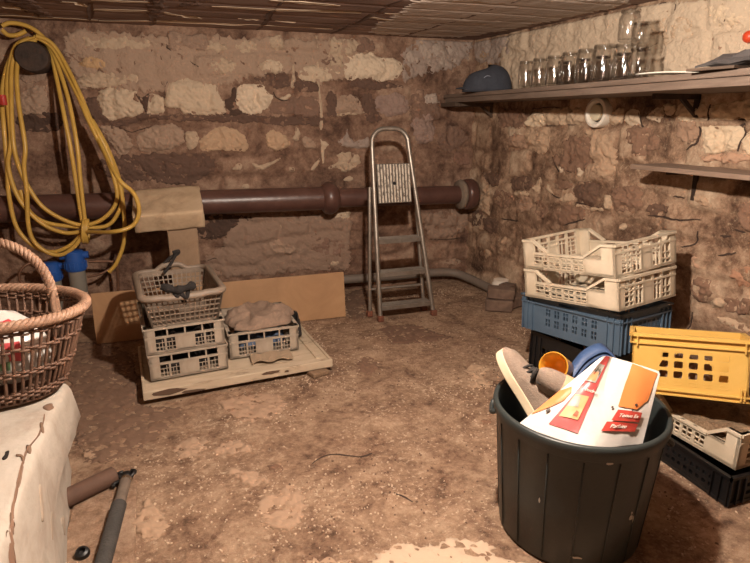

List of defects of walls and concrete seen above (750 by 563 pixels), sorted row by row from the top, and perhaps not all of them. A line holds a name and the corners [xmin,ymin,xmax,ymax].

crack [686,104,711,150]
crack [737,118,747,151]